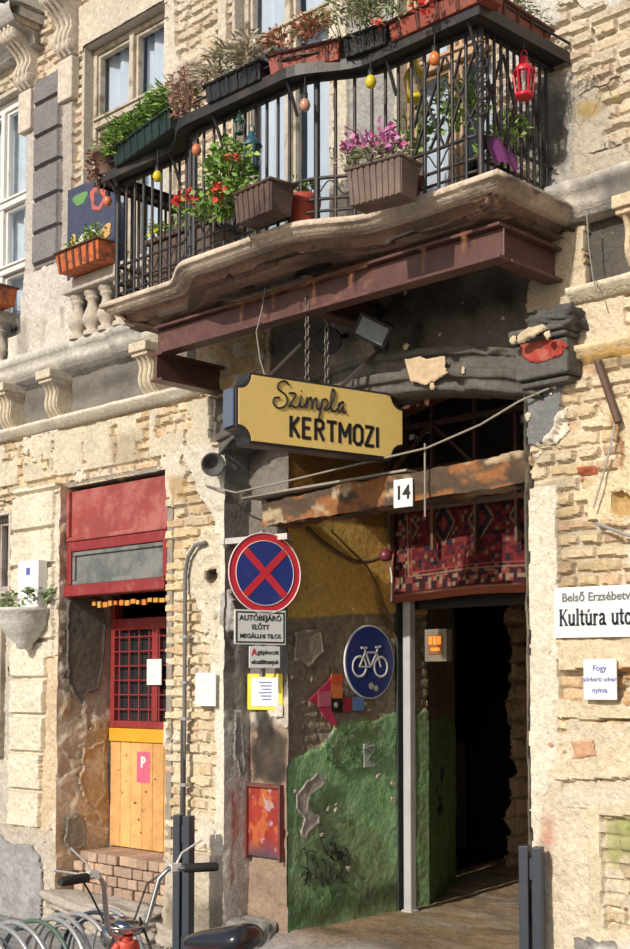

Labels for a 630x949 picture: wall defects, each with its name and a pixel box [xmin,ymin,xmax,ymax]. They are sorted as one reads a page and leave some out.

crack [577,63,630,97]
peeling [509,324,568,363]
spalling [403,343,448,390]
peeling [534,407,571,458]
flaking render [577,466,598,481]
spalling [607,487,630,521]
spalling [203,566,220,587]